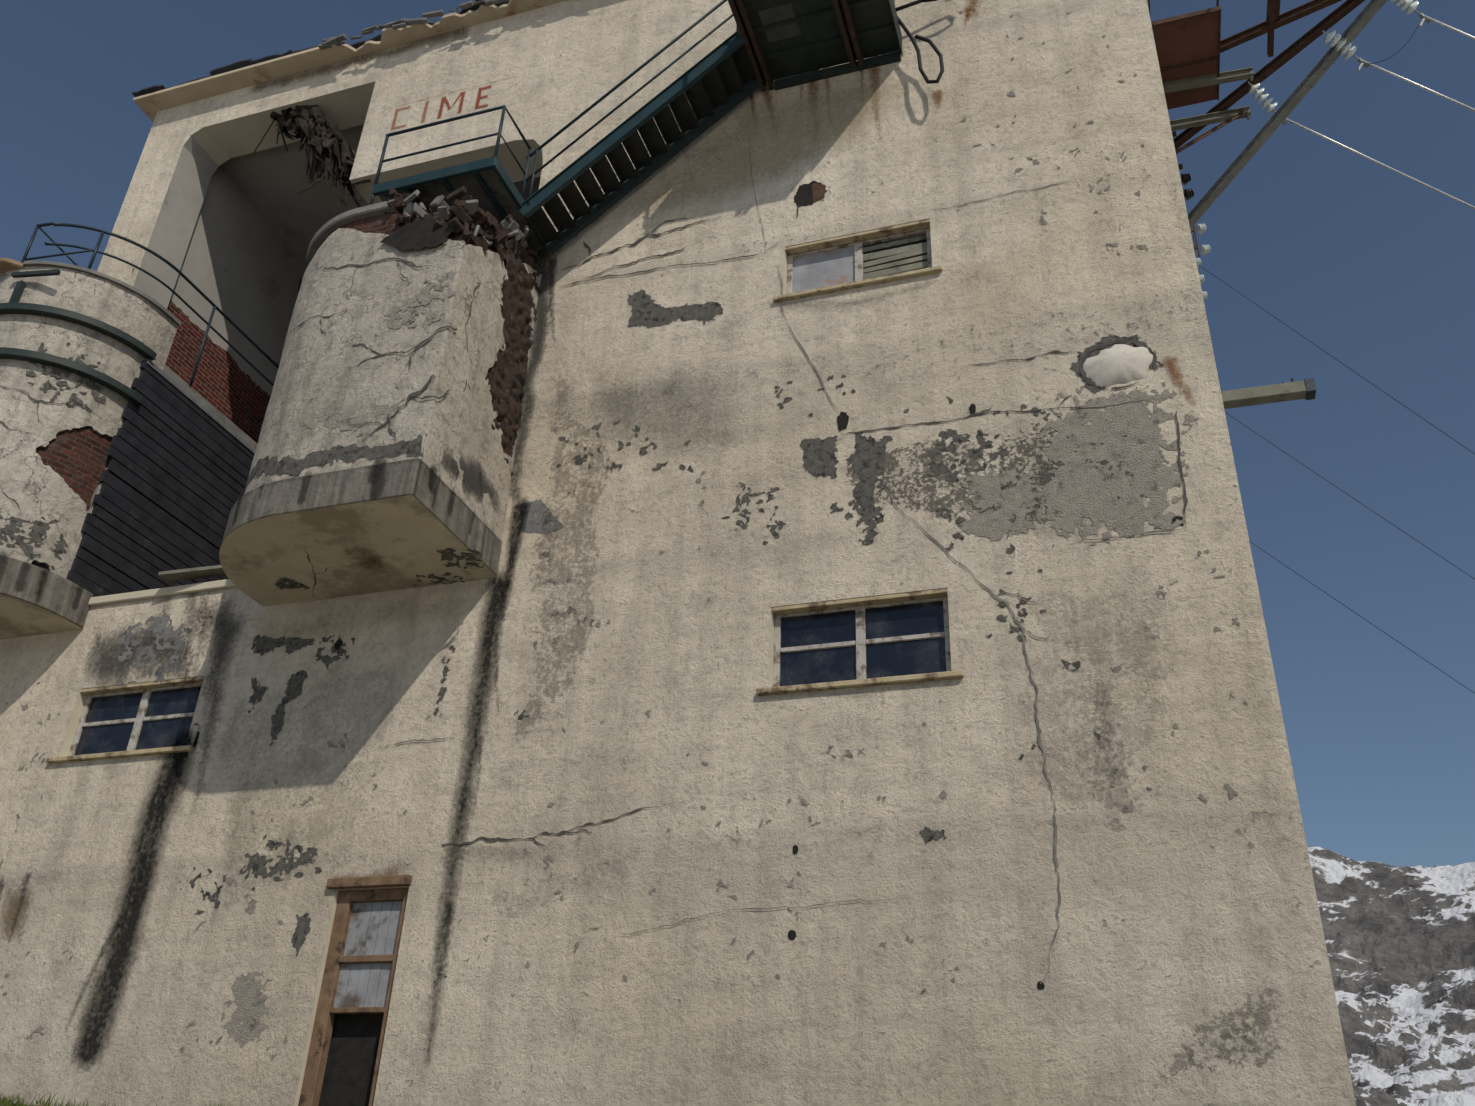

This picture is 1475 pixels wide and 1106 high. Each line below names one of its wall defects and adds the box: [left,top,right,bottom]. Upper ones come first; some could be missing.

spalling [26,342,112,511]
leakage [298,471,311,502]
leakage [369,458,386,498]
crack [298,257,481,442]
spalling [484,220,540,477]
peeling [627,290,723,328]
peeling [800,375,893,545]
crack [559,102,1189,540]
leakage [76,606,239,1063]
leakage [429,454,528,970]
crack [442,801,685,849]
crack [891,498,1061,984]